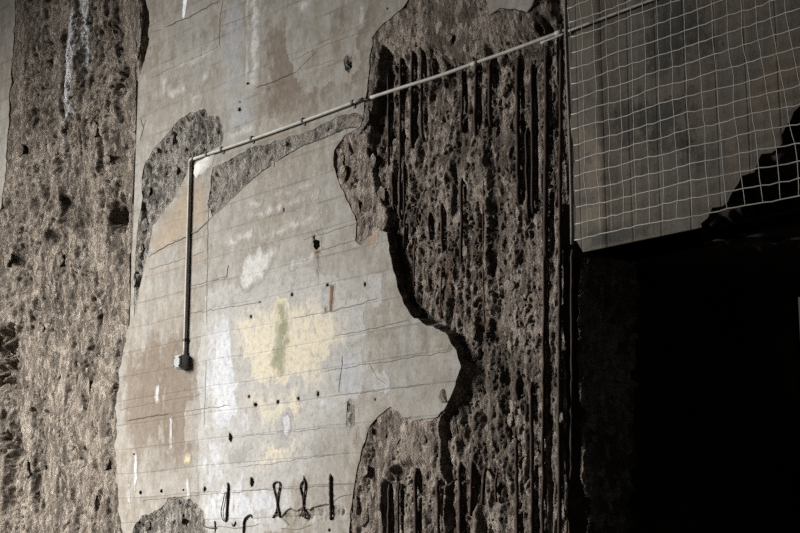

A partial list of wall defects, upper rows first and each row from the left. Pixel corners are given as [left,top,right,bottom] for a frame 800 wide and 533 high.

damp [56,0,94,201]
spalling [0,0,224,533]
damp [116,173,398,533]
corrosion [323,283,336,313]
spalling [209,0,640,533]